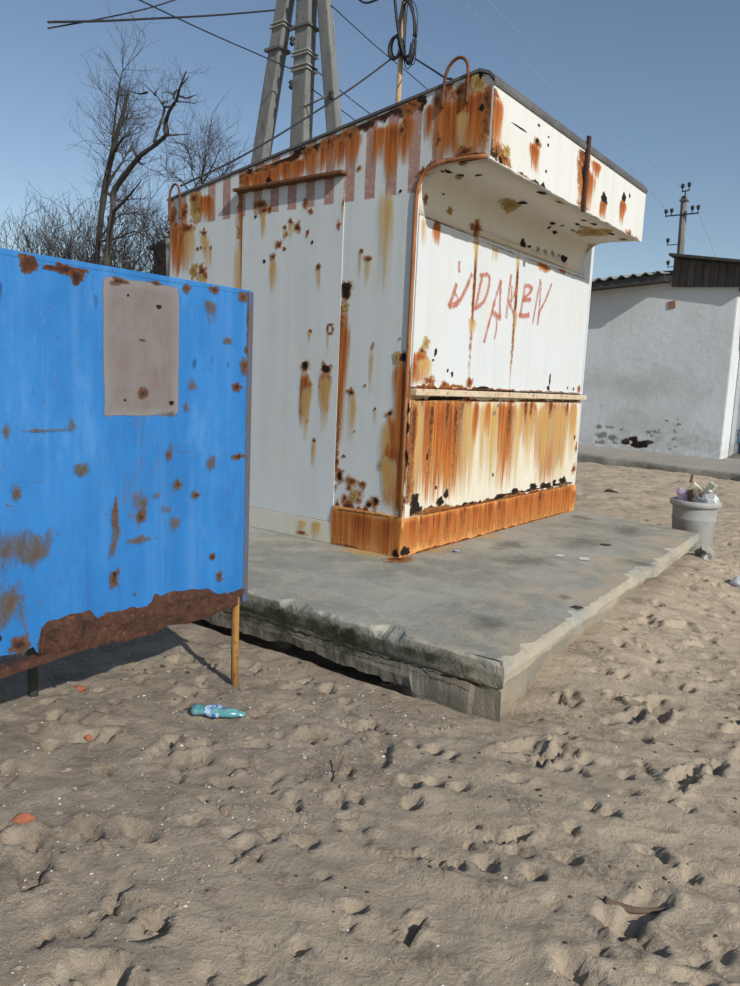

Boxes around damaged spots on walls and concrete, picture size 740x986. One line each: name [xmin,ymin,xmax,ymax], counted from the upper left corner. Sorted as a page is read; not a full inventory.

rust [519,138,546,195]
rust [577,149,601,210]
rust [18,253,89,286]
rust [170,193,219,315]
rust [232,72,504,392]
rust [423,217,585,372]
rust [297,301,580,563]
spalling [595,418,681,450]
rust [110,497,150,555]
rust [9,569,238,657]